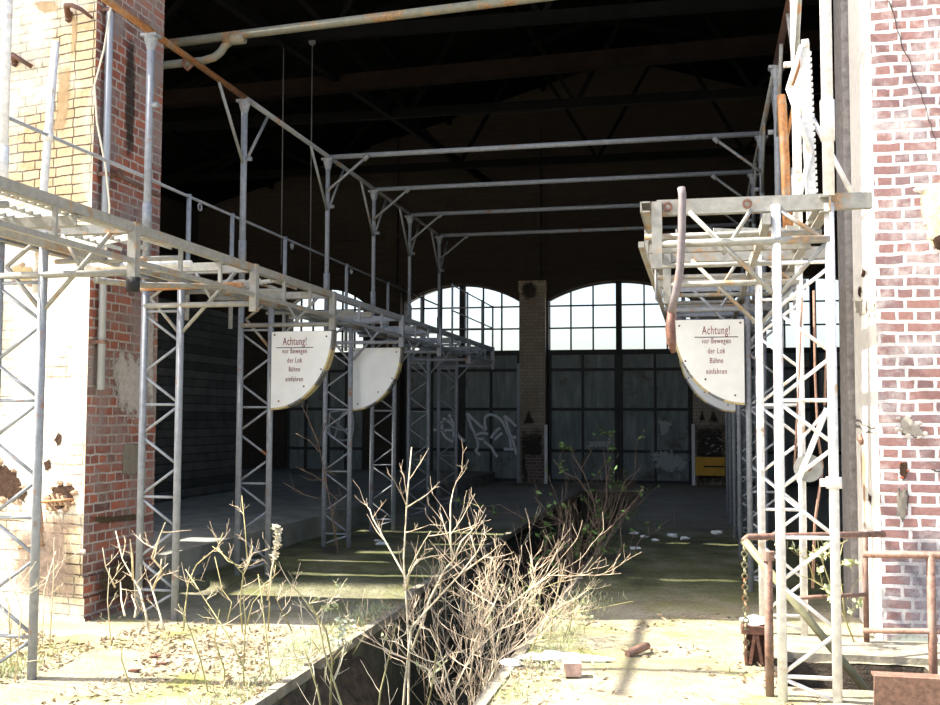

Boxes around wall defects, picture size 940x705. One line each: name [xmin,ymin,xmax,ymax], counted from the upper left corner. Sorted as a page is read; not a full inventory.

spalling [895,415,928,439]
spalling [0,458,28,505]
spalling [43,480,78,513]